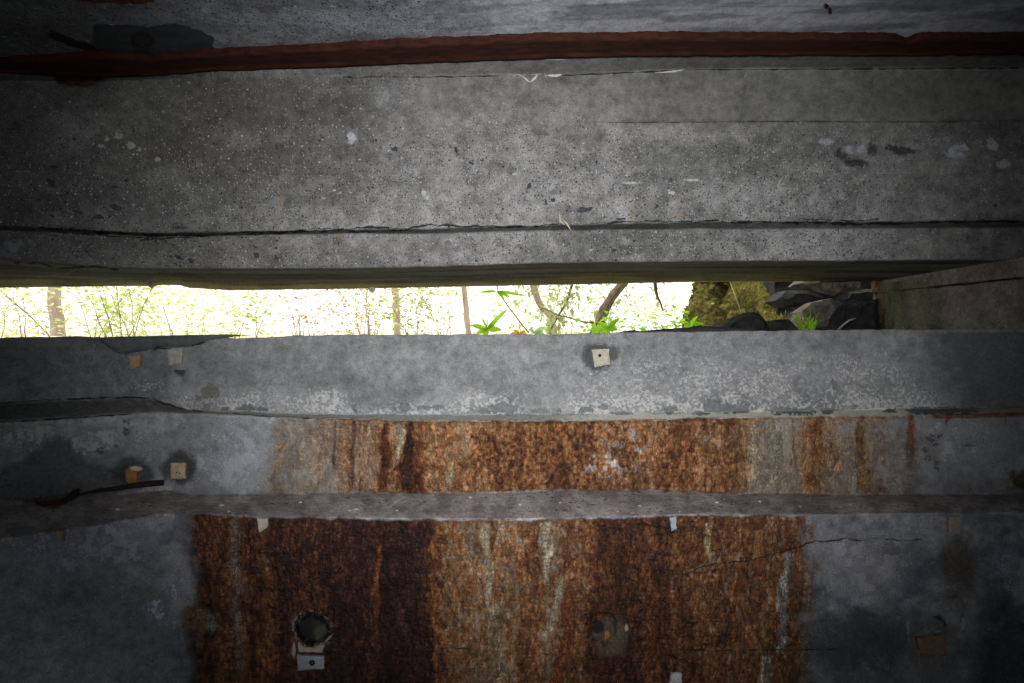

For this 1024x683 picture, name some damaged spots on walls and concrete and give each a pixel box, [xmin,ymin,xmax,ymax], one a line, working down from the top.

crack [37,223,558,241]
crack [591,218,1018,226]
peeling [196,384,268,411]
rust [269,415,915,495]
crack [657,521,919,573]
rust [187,513,818,683]